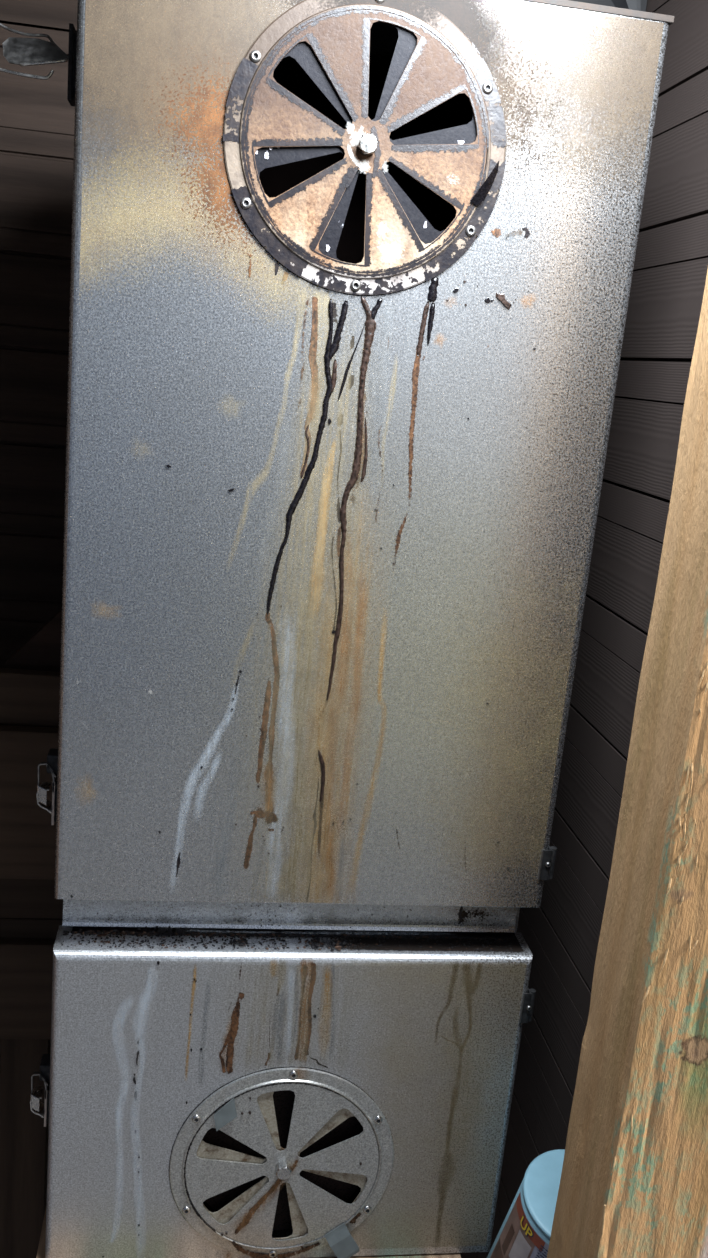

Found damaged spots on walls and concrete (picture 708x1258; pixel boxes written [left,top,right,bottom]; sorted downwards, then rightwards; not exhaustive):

rust [142,48,289,284]
rust [300,295,329,479]
rust [310,443,335,615]
rust [244,605,284,869]
rust [311,563,364,890]
rust [169,961,392,1258]